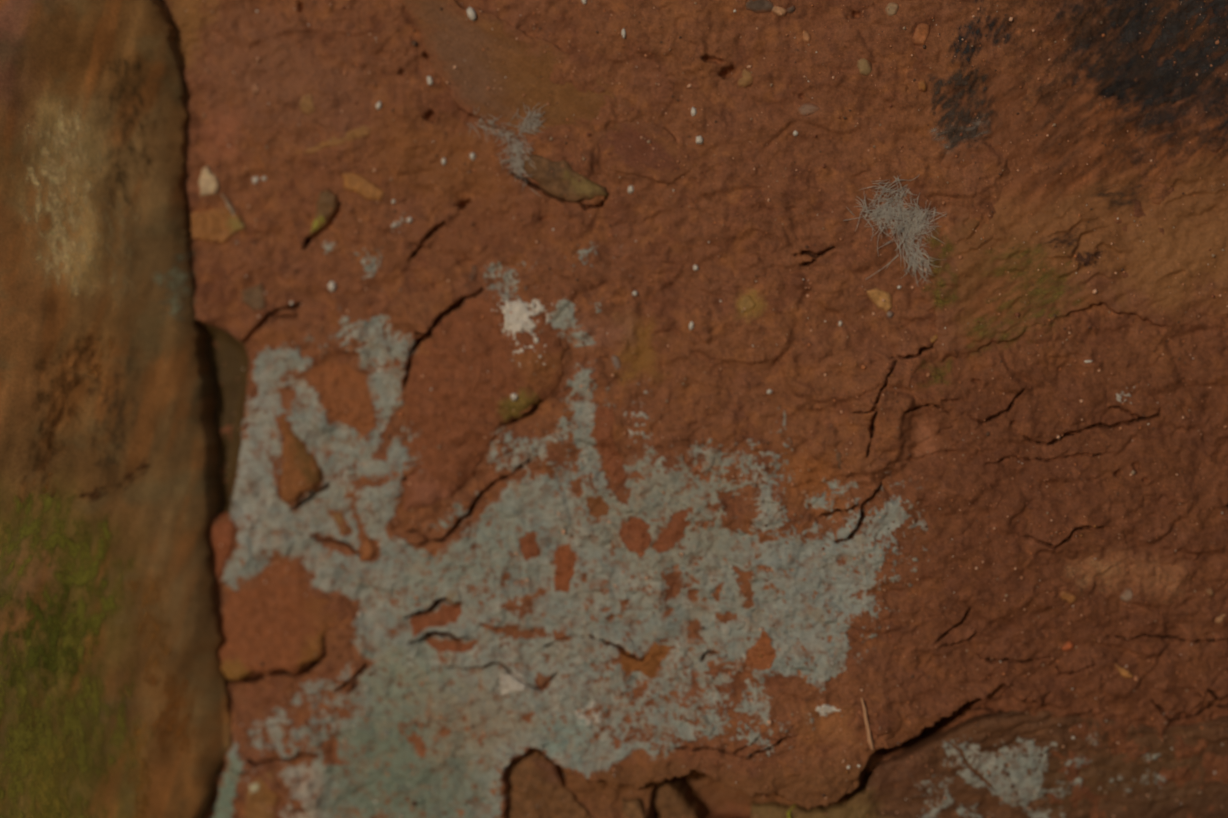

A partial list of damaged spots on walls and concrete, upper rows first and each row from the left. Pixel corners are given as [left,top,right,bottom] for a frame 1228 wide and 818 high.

damp [932,0,1010,148]
damp [1063,0,1228,152]
crack [403,287,484,388]
spalling [304,361,376,439]
crack [820,342,1024,543]
crack [985,406,1161,464]
crack [406,456,536,547]
spalling [520,531,577,592]
spalling [618,508,689,558]
spalling [409,598,475,653]
spalling [619,643,671,678]
crack [937,607,1095,675]